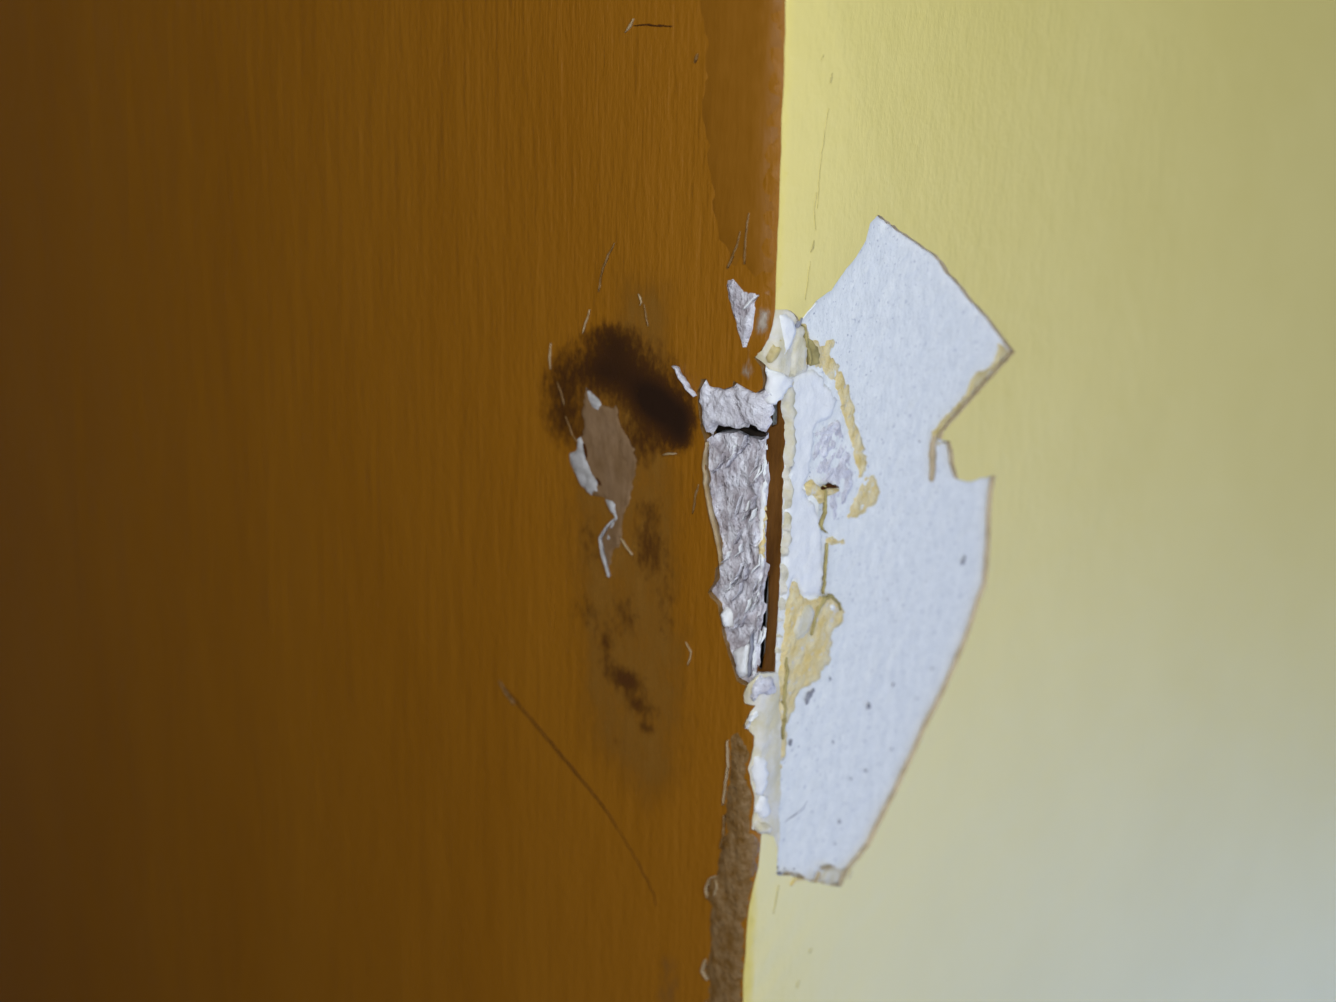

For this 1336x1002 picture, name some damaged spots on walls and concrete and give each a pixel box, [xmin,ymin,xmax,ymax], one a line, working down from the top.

peeling [570,388,638,577]
leakage [544,323,696,454]
peeling [671,216,1010,1002]